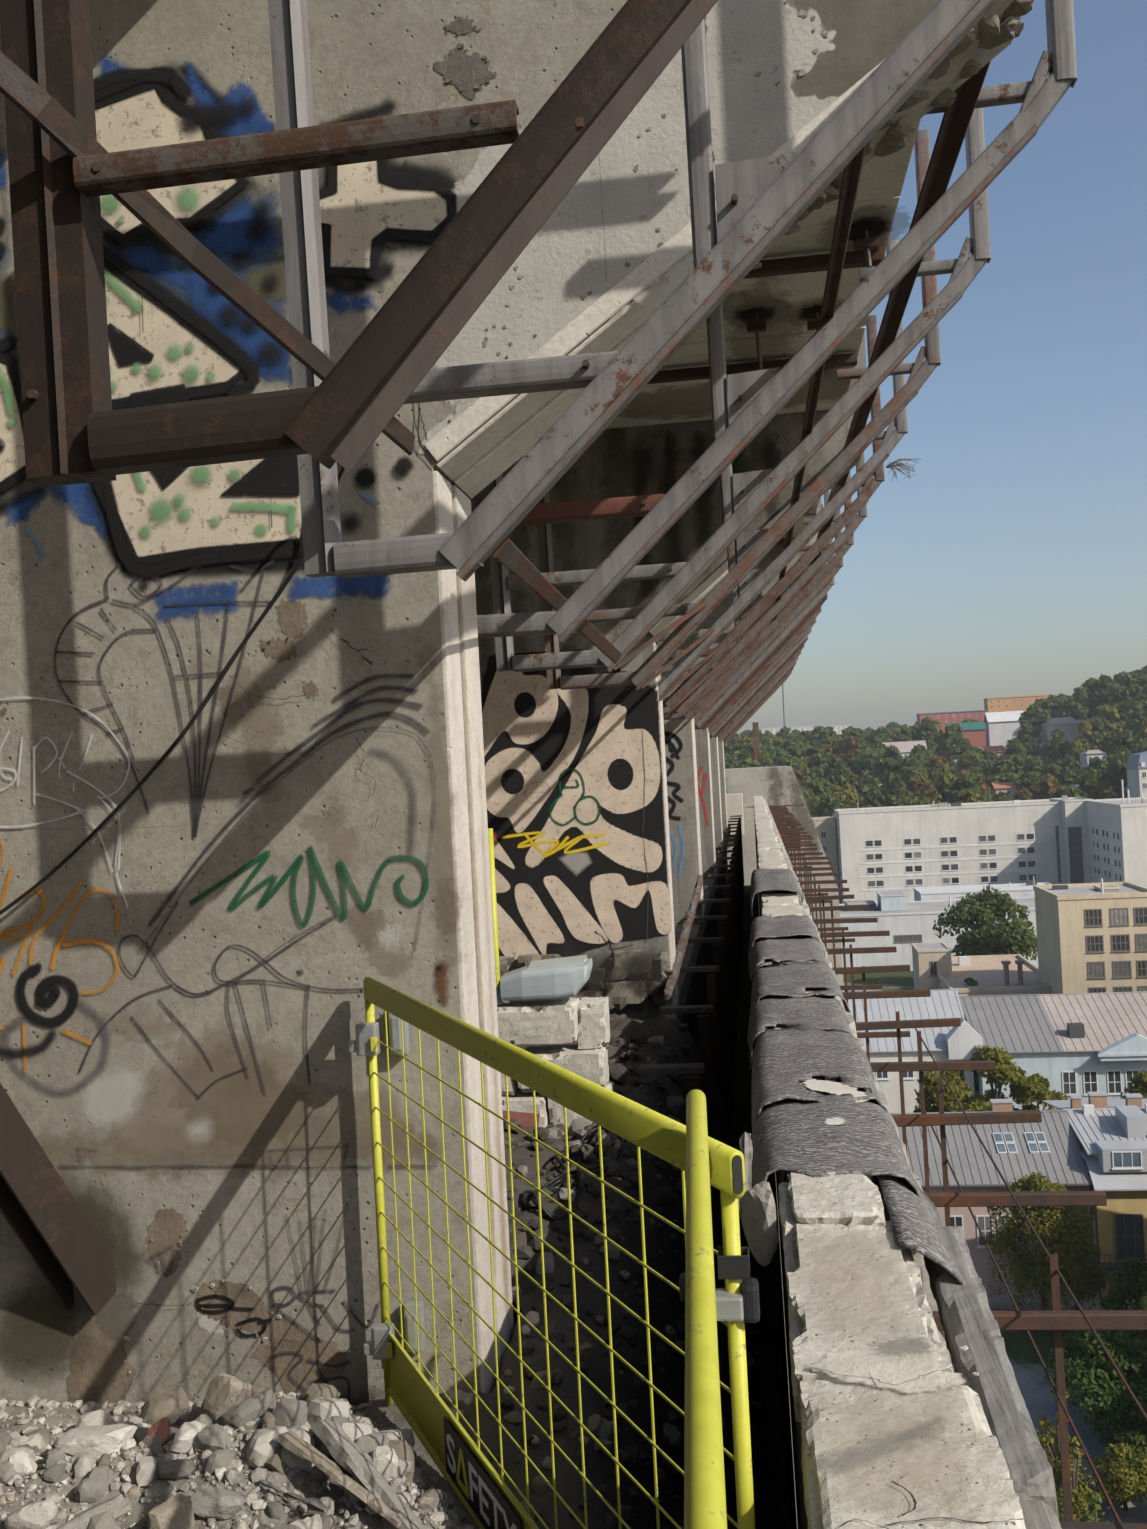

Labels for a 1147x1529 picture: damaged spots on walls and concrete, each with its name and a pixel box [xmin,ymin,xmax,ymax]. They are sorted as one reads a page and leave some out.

spalling [433,15,497,100]
spalling [864,0,1034,157]
spalling [784,172,843,235]
flaking render [145,1208,187,1276]
spalling [741,1181,779,1267]
flaking render [191,1280,347,1394]
crack [835,1481,1023,1529]